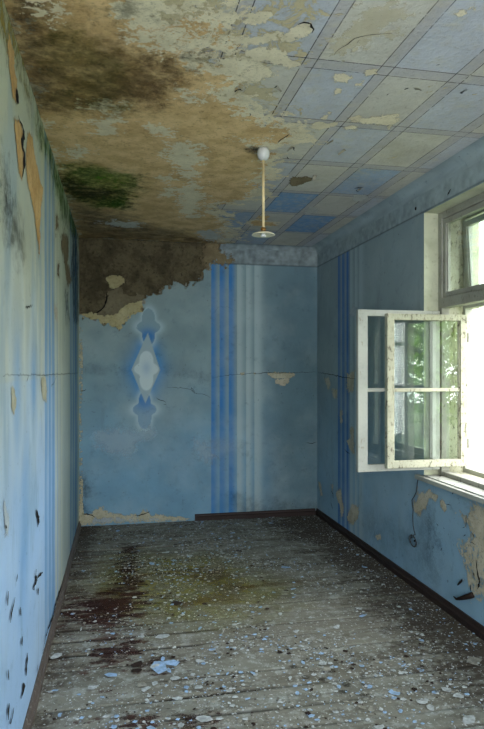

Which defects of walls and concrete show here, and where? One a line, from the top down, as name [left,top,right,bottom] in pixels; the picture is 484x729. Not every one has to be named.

leakage [0,0,40,70]
peeling [324,0,421,63]
peeling [4,0,400,331]
leakage [39,126,176,322]
peeling [267,372,295,386]
spalling [79,476,190,526]
peeling [413,489,447,516]
peeling [455,500,484,603]